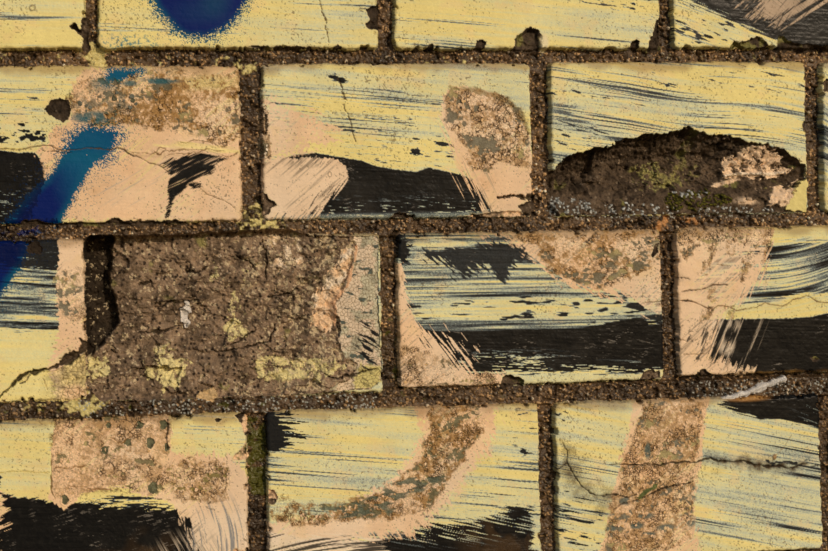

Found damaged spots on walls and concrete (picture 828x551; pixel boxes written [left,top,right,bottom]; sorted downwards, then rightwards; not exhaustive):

peeling [44,65,273,160]
peeling [441,85,532,175]
spalling [458,192,535,218]
spalling [513,126,808,327]
crack [0,338,95,403]
spalling [17,218,524,506]
peeling [263,401,487,530]
peeling [601,395,711,551]
crack [555,434,820,521]